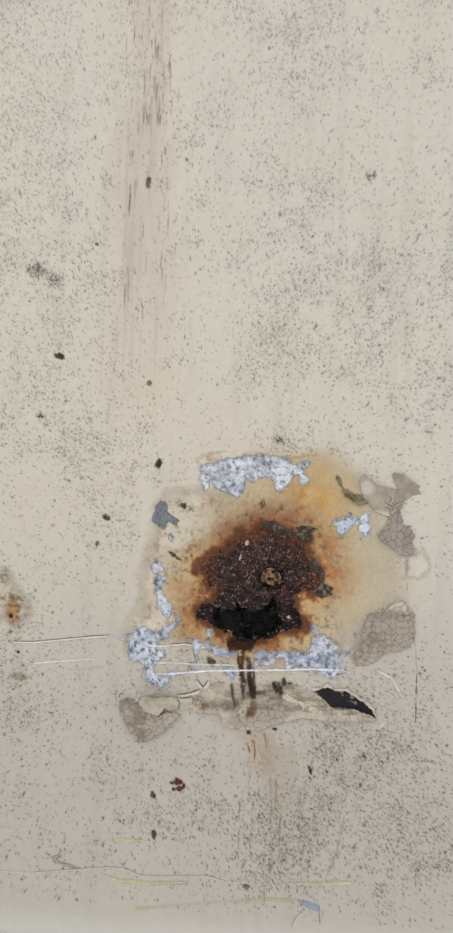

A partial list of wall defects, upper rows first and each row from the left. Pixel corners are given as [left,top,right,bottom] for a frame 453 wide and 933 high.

peeling [199,454,310,499]
peeling [152,501,179,542]
peeling [259,519,318,543]
peeling [332,473,421,556]
rust [7,599,20,620]
rust [166,461,391,717]
peeling [119,558,415,743]